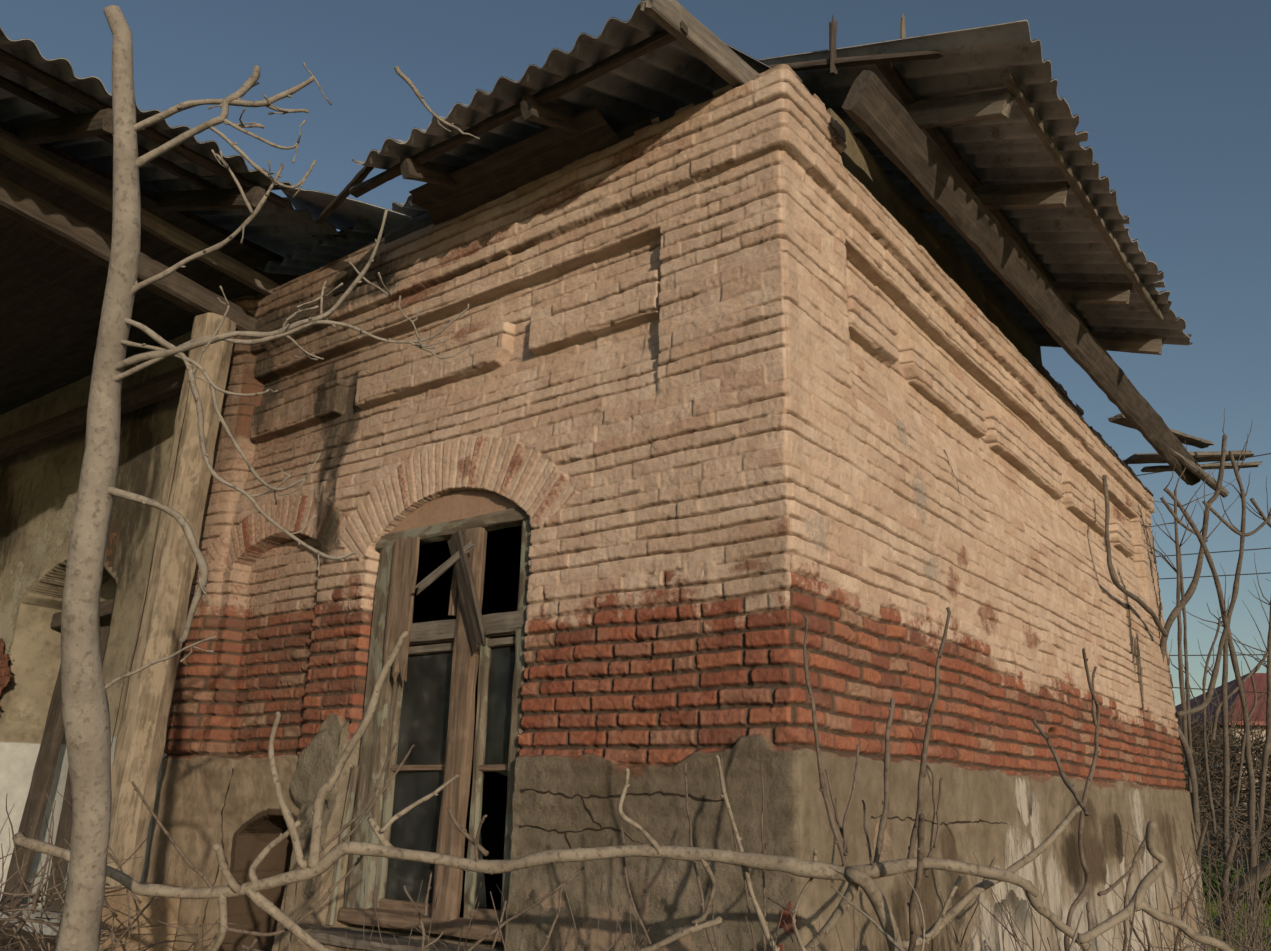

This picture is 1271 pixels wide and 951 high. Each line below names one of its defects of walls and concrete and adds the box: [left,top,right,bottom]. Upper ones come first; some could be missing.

damp [245,253,399,430]
damp [313,364,360,561]
crack [519,789,730,849]
crack [871,814,1011,842]
damp [1066,798,1121,889]